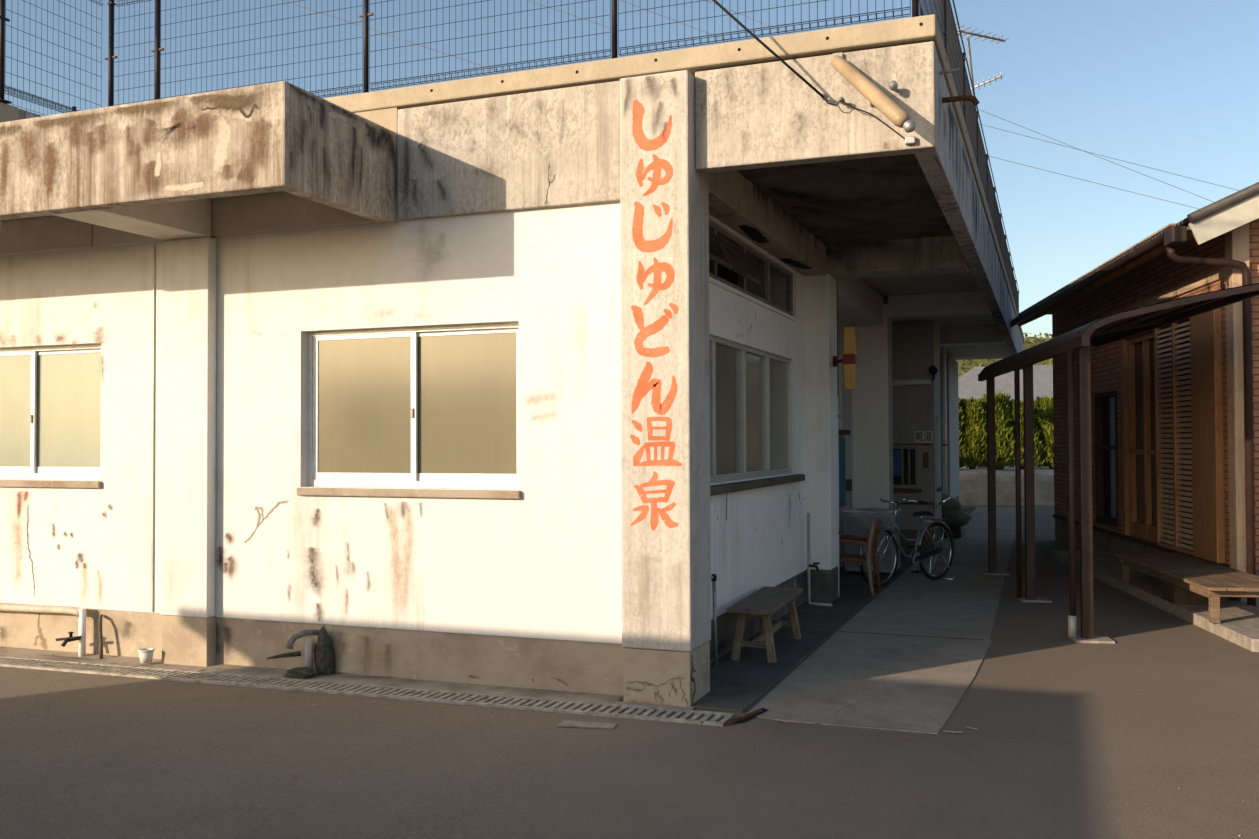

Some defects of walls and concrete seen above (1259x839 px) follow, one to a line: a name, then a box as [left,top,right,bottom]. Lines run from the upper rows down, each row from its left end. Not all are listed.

damp [0,114,105,194]
damp [116,94,255,190]
damp [290,85,430,200]
crack [628,656,696,704]